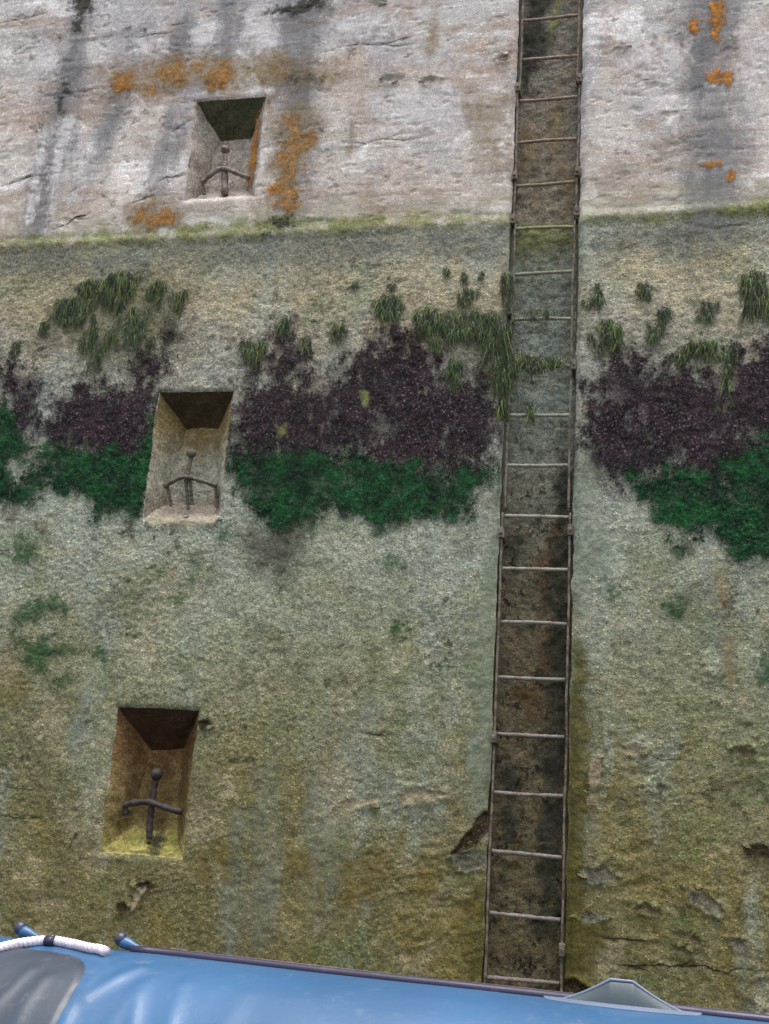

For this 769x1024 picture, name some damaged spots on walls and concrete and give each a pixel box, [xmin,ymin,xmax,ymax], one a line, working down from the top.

water stain [21,0,95,236]
water stain [611,0,769,229]
spalling [446,810,488,873]
crack [587,935,769,974]